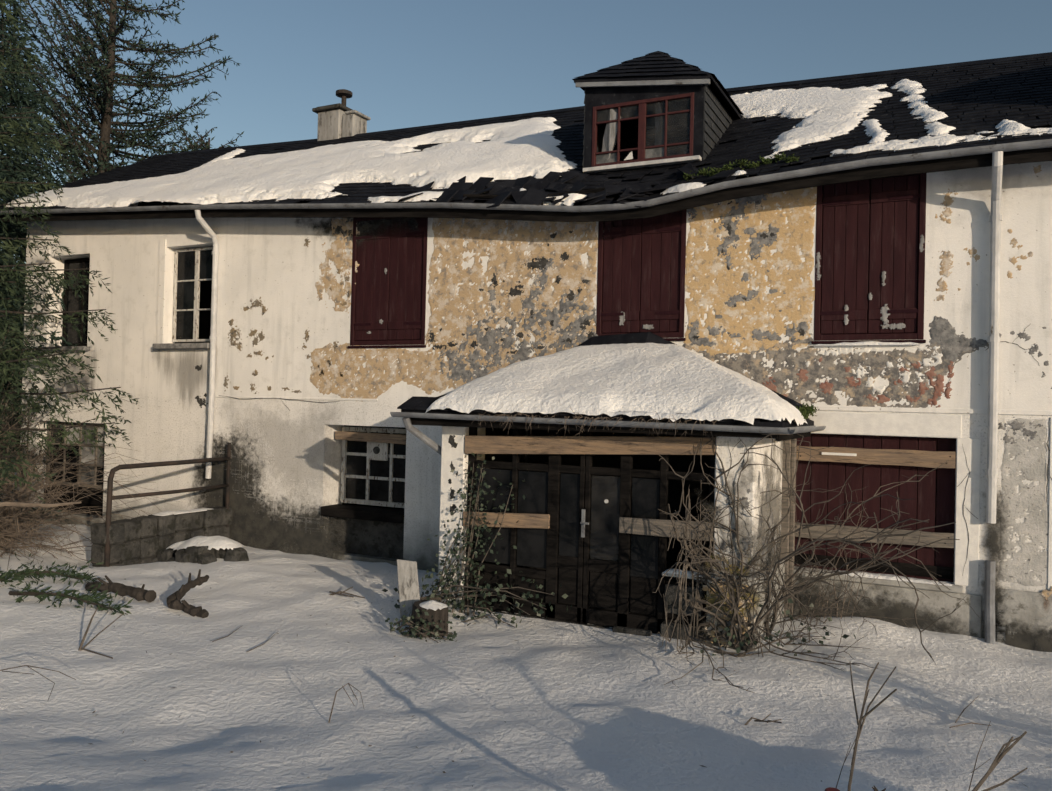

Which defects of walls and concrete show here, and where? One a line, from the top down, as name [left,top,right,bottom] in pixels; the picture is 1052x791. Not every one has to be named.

peeling [243,297,268,316]
peeling [223,319,301,394]
peeling [302,218,598,401]
peeling [682,187,989,408]
damp [193,434,344,560]